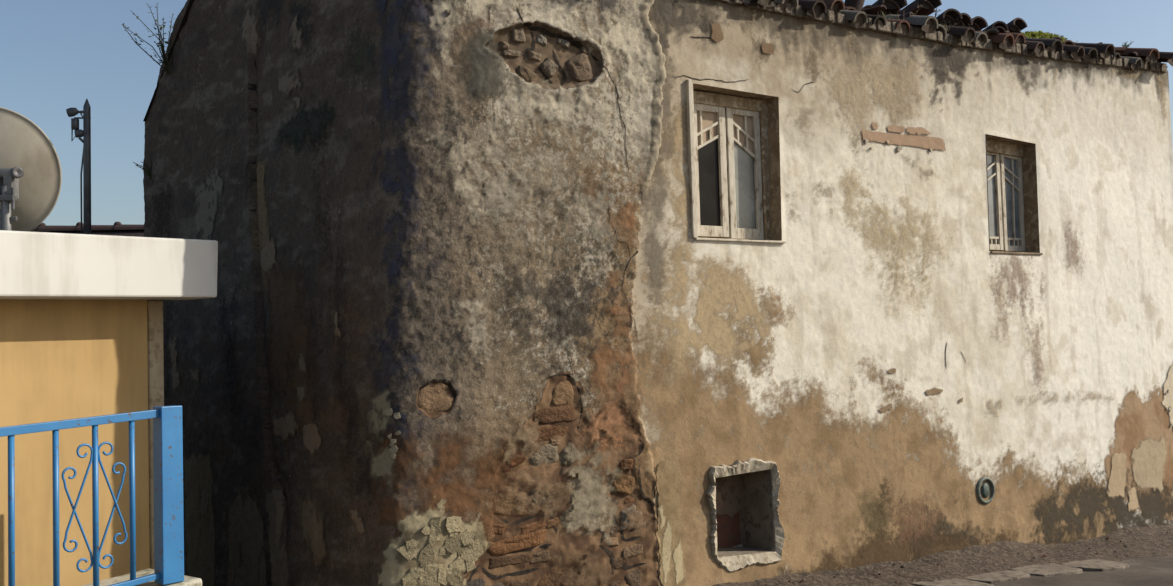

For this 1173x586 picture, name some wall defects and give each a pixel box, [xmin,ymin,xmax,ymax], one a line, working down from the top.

spalling [491,21,603,90]
leakage [545,0,624,17]
crack [603,65,643,342]
peeling [862,123,946,153]
leakage [163,300,174,394]
leakage [334,0,447,558]
leakage [624,0,1173,586]
peeling [368,390,401,484]
spalling [378,371,686,586]
peeling [1107,365,1173,511]